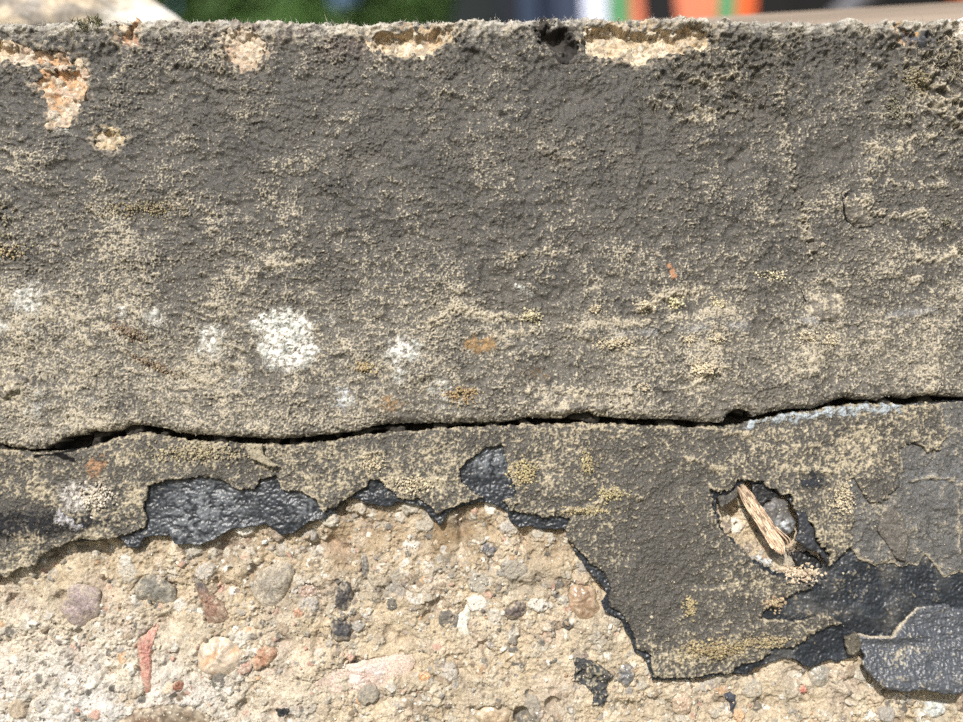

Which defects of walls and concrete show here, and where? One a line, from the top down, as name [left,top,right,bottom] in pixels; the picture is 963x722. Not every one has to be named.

spalling [365,22,453,62]
spalling [527,17,714,67]
spalling [945,17,963,45]
spalling [0,37,90,131]
crack [0,395,963,462]
peeling [0,399,963,695]